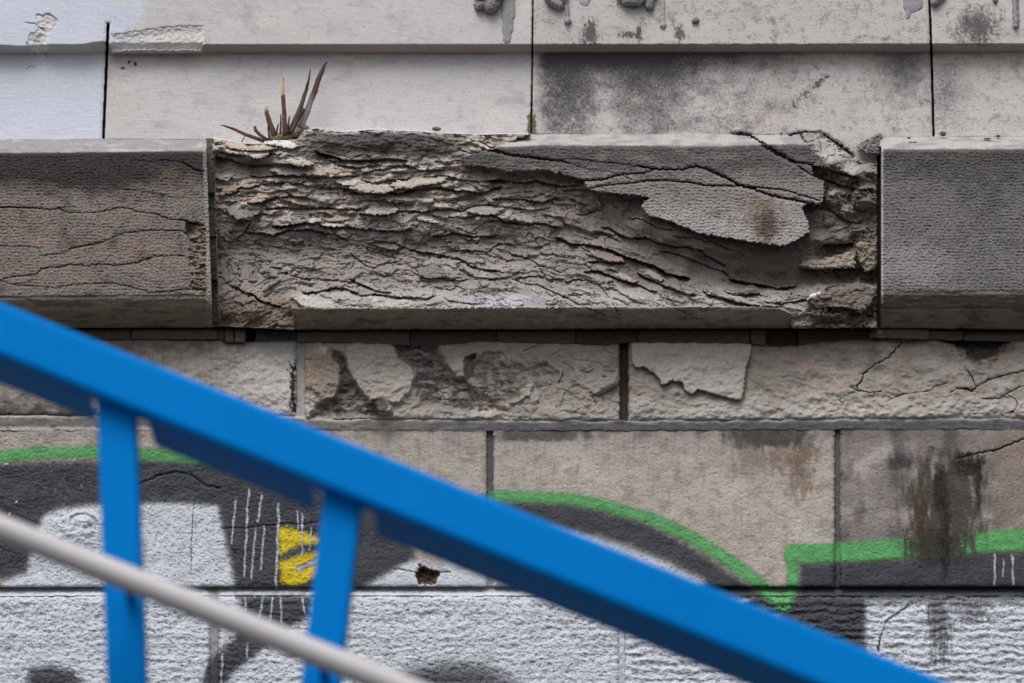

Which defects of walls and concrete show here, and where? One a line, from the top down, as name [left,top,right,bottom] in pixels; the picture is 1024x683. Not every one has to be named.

spalling [111,25,206,52]
damp [540,20,775,134]
crack [459,131,854,206]
crack [0,187,206,293]
spalling [185,128,878,330]
spalling [304,342,393,420]
spalling [395,345,562,417]
peeling [631,342,752,401]
crack [839,341,1024,414]
damp [890,446,987,574]